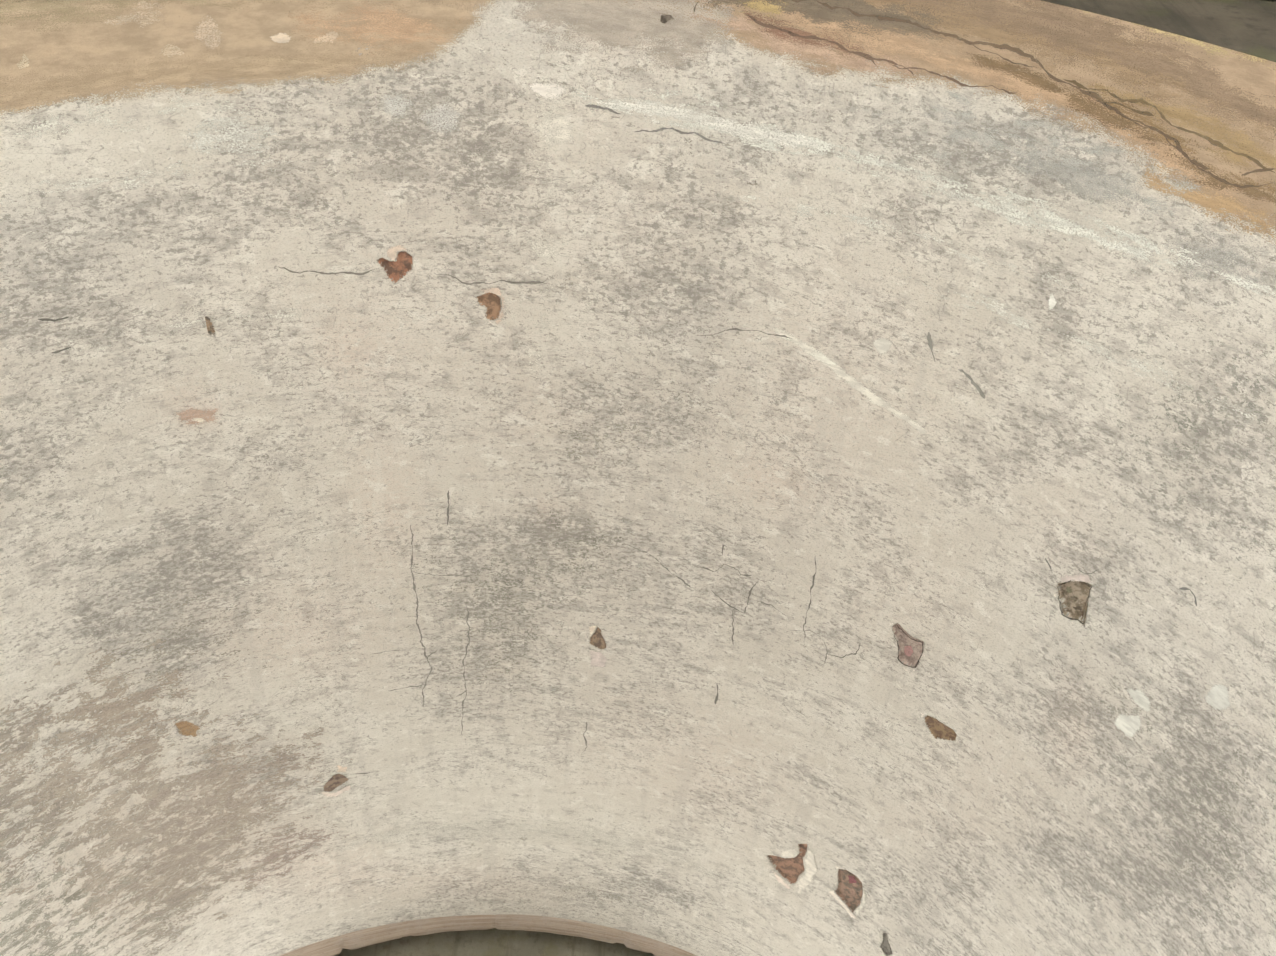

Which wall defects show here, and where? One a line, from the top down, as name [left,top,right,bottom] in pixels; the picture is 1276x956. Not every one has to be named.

crack [747,0,1275,188]
water stain [534,308,790,472]
crack [374,525,470,734]
spalling [764,841,817,894]
spalling [829,866,866,920]